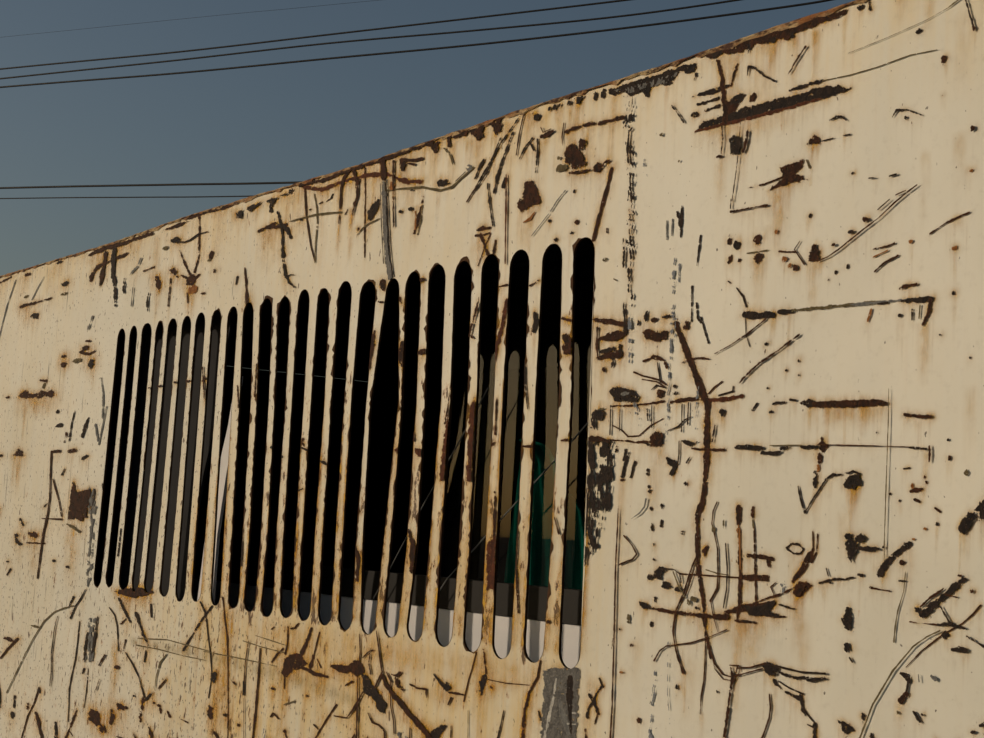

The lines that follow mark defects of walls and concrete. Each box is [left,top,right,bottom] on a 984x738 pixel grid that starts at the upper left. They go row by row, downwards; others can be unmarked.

corrosion [556,138,610,174]
corrosion [257,170,360,239]
corrosion [517,180,542,223]
corrosion [155,204,234,306]
peeling [609,386,639,403]
corrosion [37,448,92,579]
peeling [584,407,651,566]
peeling [666,440,788,486]
peeling [647,504,818,624]
corrosion [639,601,730,620]
corrosion [271,626,364,738]
peeling [540,667,580,738]